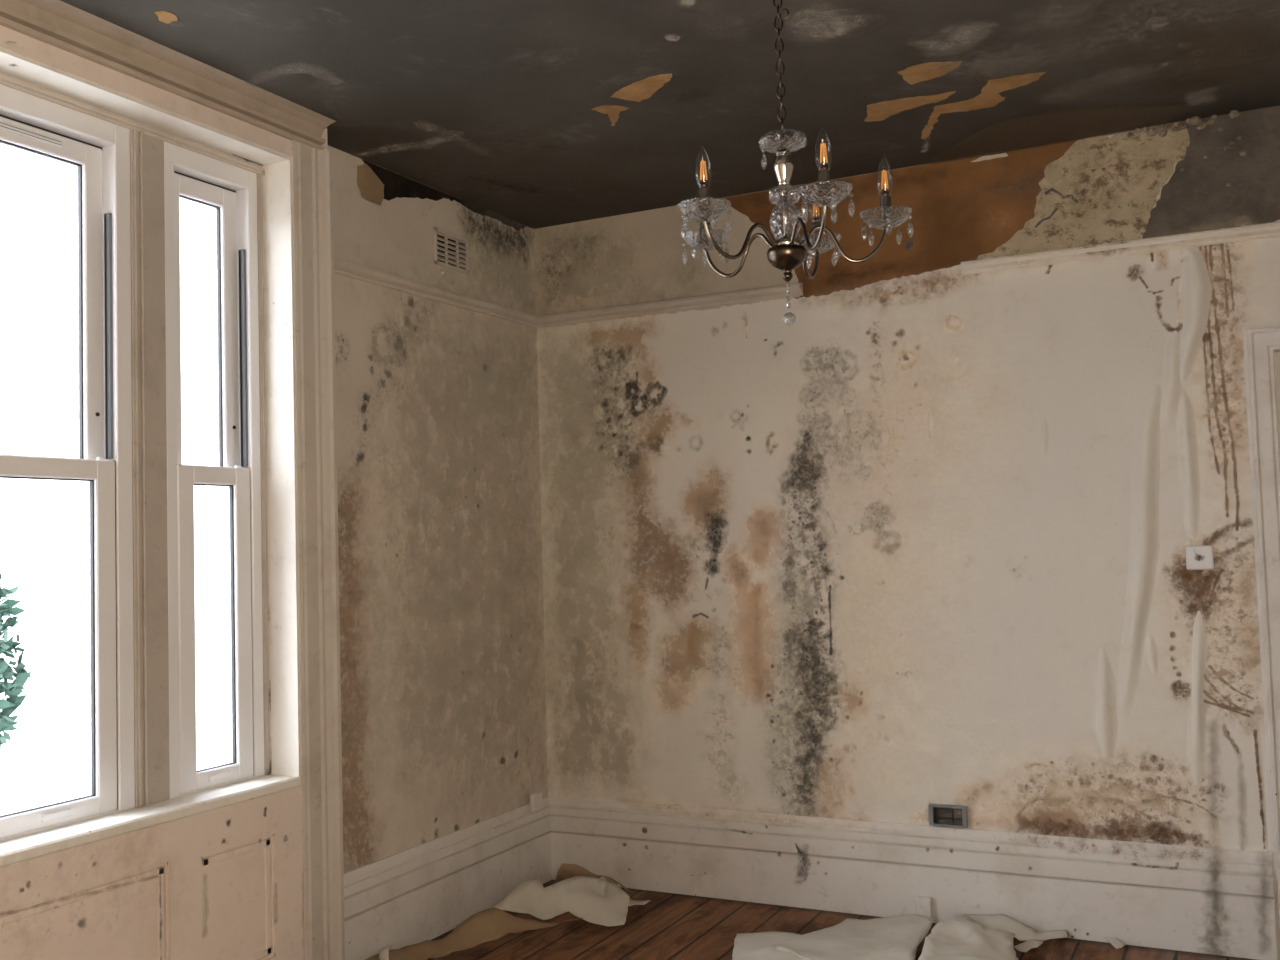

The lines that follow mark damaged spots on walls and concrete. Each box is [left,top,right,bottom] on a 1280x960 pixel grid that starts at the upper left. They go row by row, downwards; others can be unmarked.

spalling [154,10,184,27]
spalling [591,73,672,126]
peeling [357,164,384,206]
flaking render [719,61,1280,307]
damp [338,486,373,866]